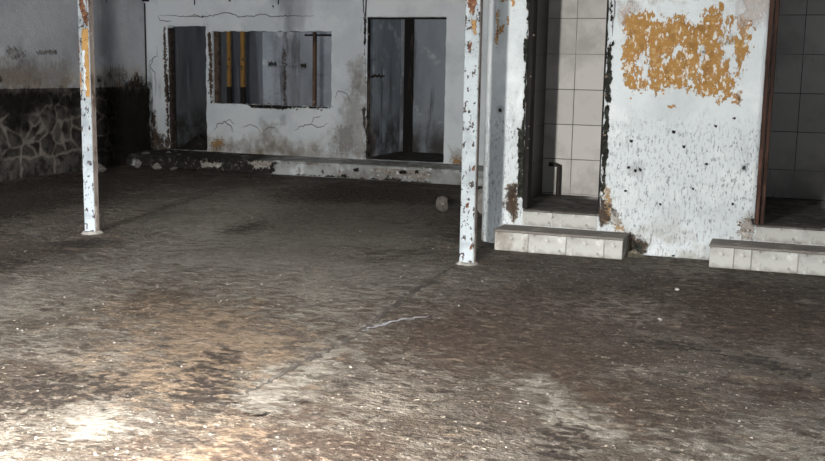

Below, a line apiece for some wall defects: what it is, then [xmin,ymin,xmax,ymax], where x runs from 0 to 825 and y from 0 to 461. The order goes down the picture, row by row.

peeling [79,0,88,27]
crack [158,12,303,22]
corrosion [466,0,477,50]
peeling [494,0,515,48]
peeling [612,0,770,105]
damp [0,88,71,131]
crack [215,116,328,133]
damp [517,0,534,198]
damp [614,221,650,254]
crack [236,266,455,399]